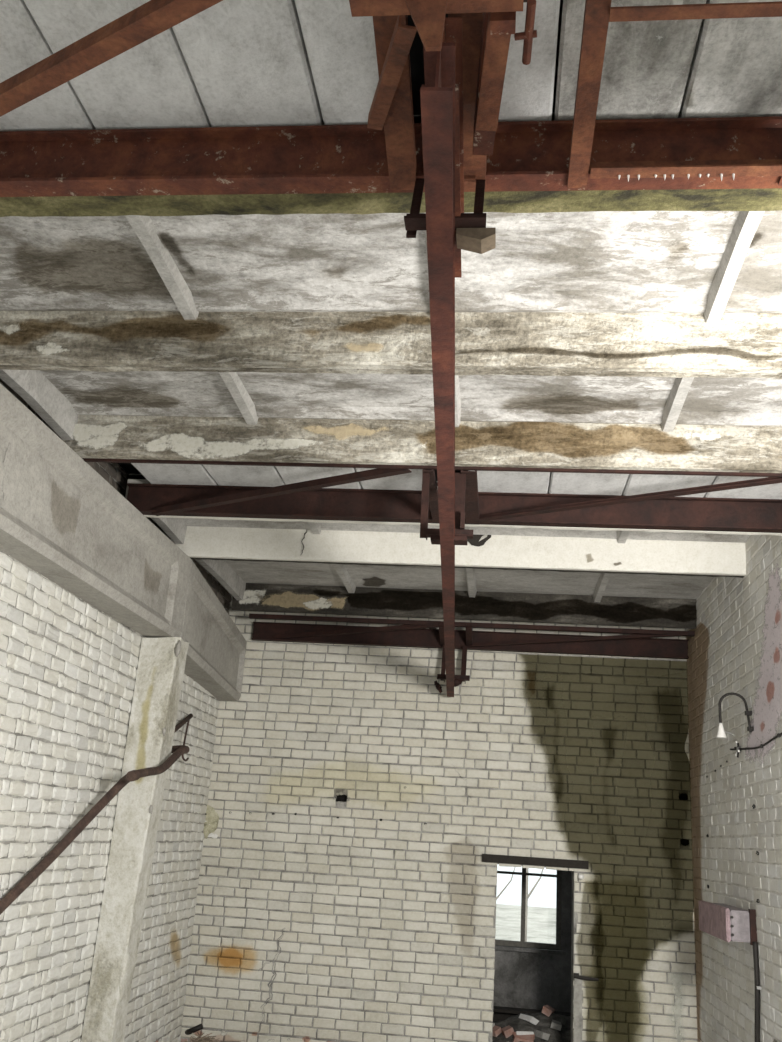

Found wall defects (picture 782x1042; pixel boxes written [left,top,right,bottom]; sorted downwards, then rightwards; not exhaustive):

leakage [159,234,193,272]
leakage [37,343,67,355]
spalling [73,422,127,449]
spalling [139,433,322,459]
leakage [314,577,697,622]
leakage [521,654,694,1042]